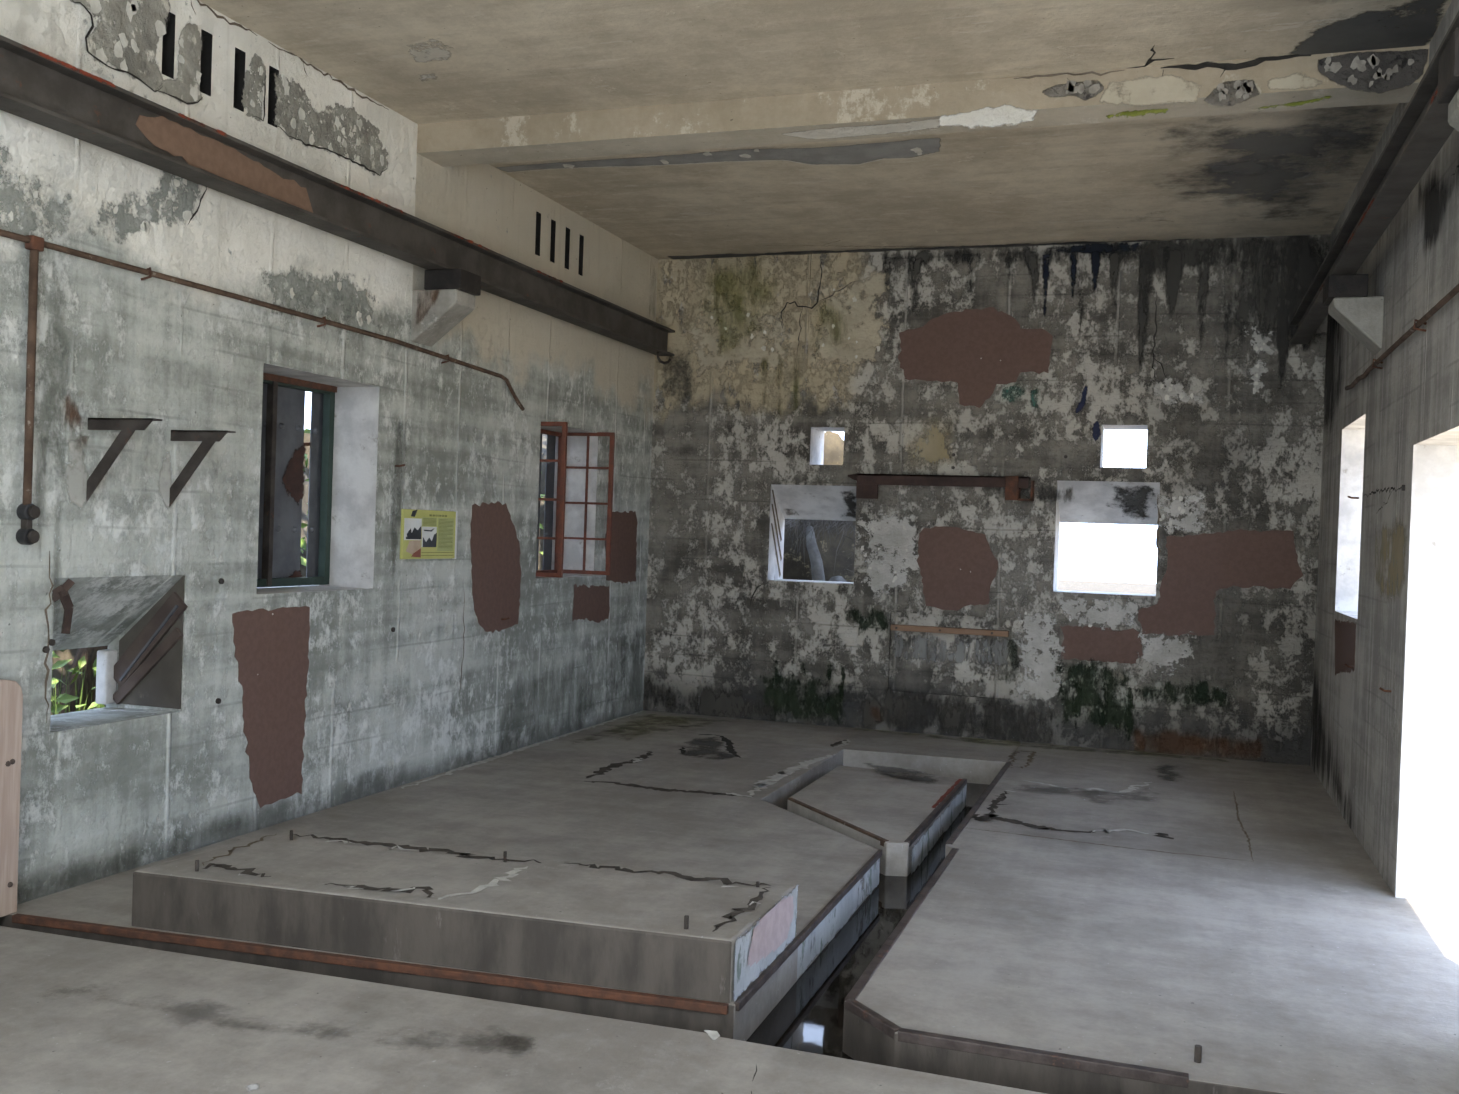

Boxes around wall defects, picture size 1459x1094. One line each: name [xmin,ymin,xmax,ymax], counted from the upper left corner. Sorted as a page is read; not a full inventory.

peeling [70,0,203,105]
spalling [1318,49,1428,93]
peeling [241,54,389,176]
leakage [782,104,1038,139]
leakage [1178,107,1384,218]
peeling [89,171,207,244]
leakage [668,235,1341,431]
leakage [662,356,692,401]
peeling [856,512,920,598]
peeling [1011,597,1197,701]
leakage [643,678,776,721]
leakage [860,686,1053,744]